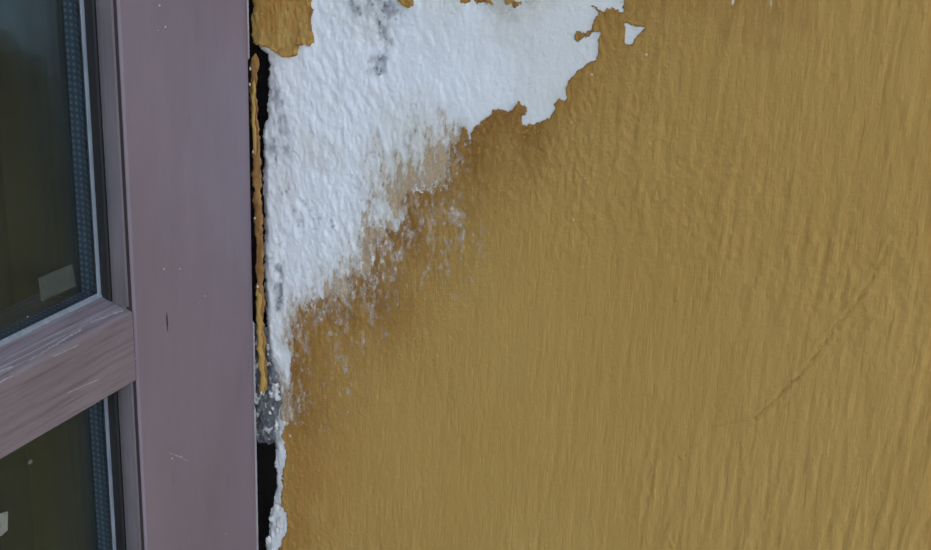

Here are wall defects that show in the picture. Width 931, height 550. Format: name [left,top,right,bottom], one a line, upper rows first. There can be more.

peeling [251,0,624,550]
peeling [624,23,645,45]